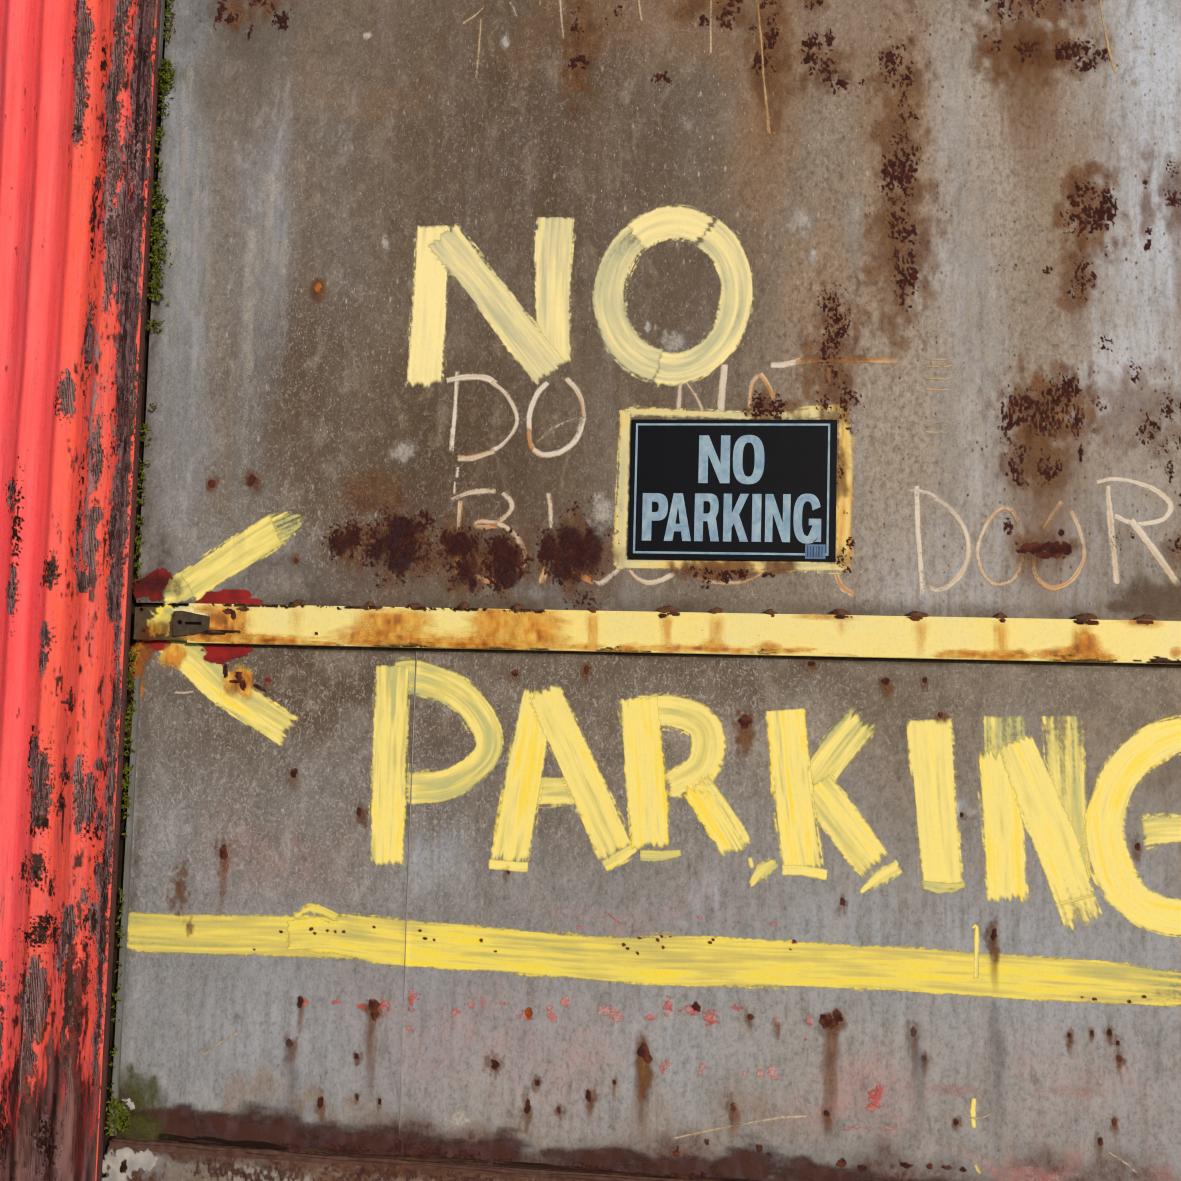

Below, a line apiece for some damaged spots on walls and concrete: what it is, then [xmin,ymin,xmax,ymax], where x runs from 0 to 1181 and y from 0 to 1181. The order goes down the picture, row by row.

corrosion [976,0,1112,86]
corrosion [676,0,930,331]
corrosion [1053,162,1118,307]
corrosion [742,285,865,434]
corrosion [988,361,1107,486]
corrosion [1004,518,1074,563]
corrosion [185,607,257,643]
corrosion [988,618,1103,660]
corrosion [637,1037,653,1099]
corrosion [819,1009,845,1072]
corrosion [117,1066,523,1181]
corrosion [541,1145,967,1181]